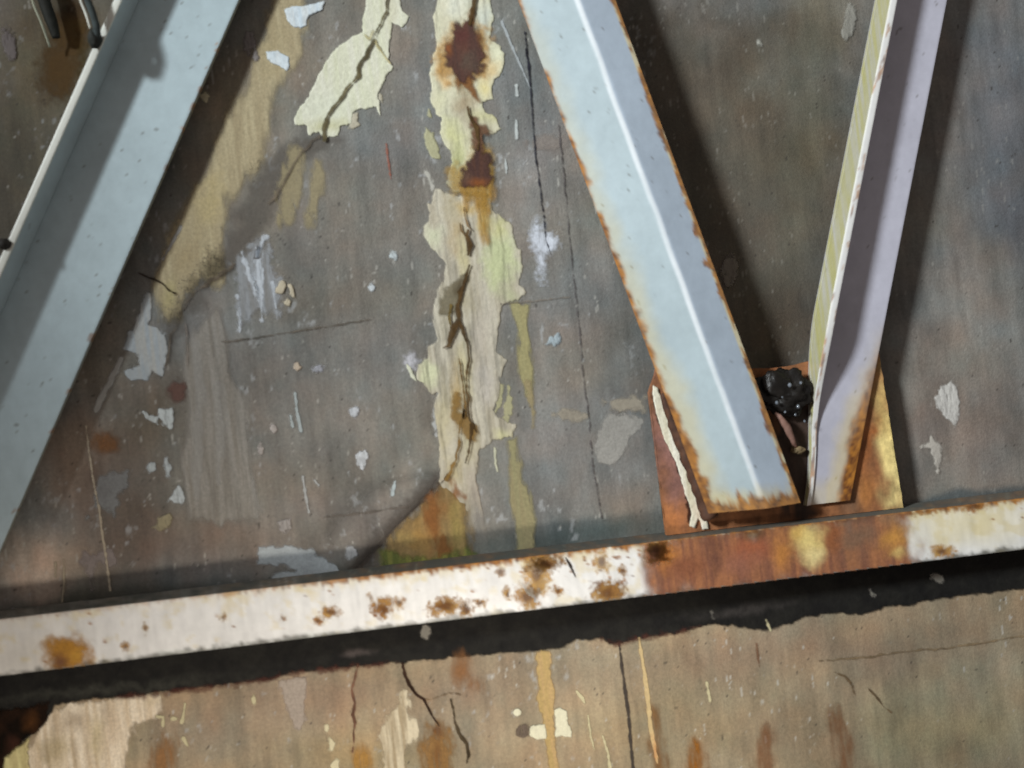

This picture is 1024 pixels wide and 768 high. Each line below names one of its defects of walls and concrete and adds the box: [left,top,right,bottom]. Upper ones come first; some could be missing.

peeling [294,0,409,138]
corrosion [438,14,487,100]
crack [468,0,476,25]
damp [153,0,327,336]
corrosion [450,117,493,242]
peeling [406,0,526,522]
crack [522,32,602,518]
crack [327,208,477,523]
peeling [935,382,960,425]
corrosion [428,596,485,617]
corrosion [644,514,912,594]
crack [402,663,470,763]